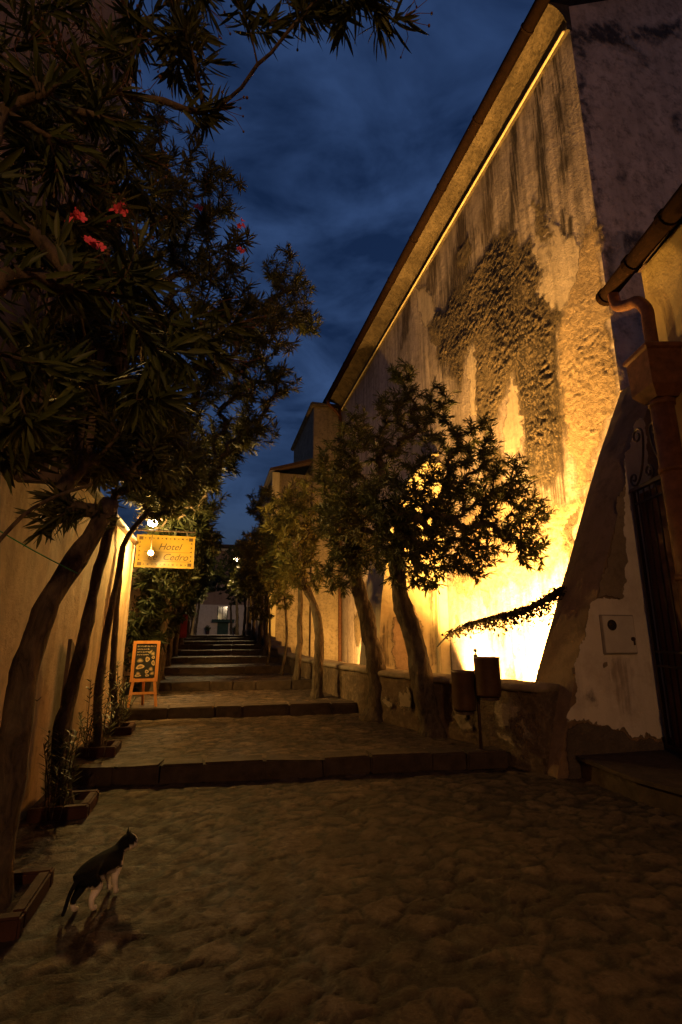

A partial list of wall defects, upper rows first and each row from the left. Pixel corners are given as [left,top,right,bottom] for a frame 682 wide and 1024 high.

leakage [533,57,572,237]
leakage [401,298,410,351]
leakage [426,157,495,378]
leakage [488,121,565,504]